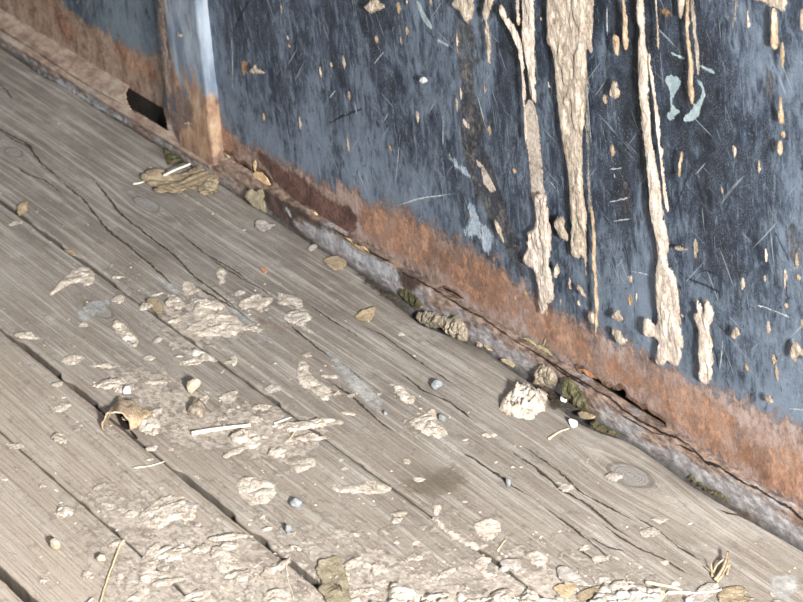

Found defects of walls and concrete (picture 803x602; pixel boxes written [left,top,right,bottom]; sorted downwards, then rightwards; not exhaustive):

rust [221,118,803,507]